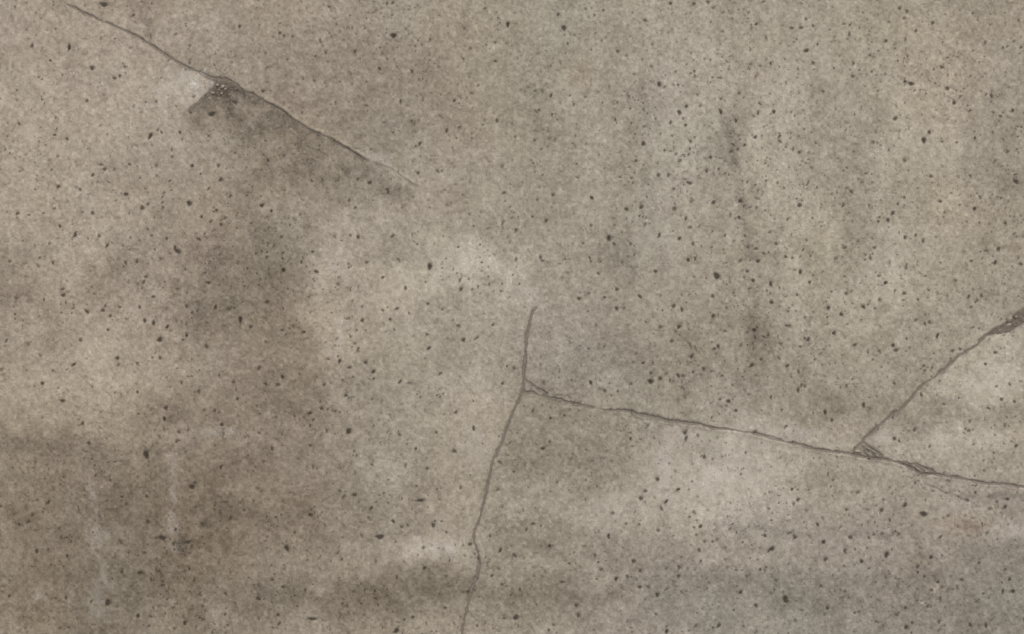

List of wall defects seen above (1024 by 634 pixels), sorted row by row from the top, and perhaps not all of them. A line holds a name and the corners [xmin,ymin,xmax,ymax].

crack [67,4,411,184]
crack [461,307,1024,634]